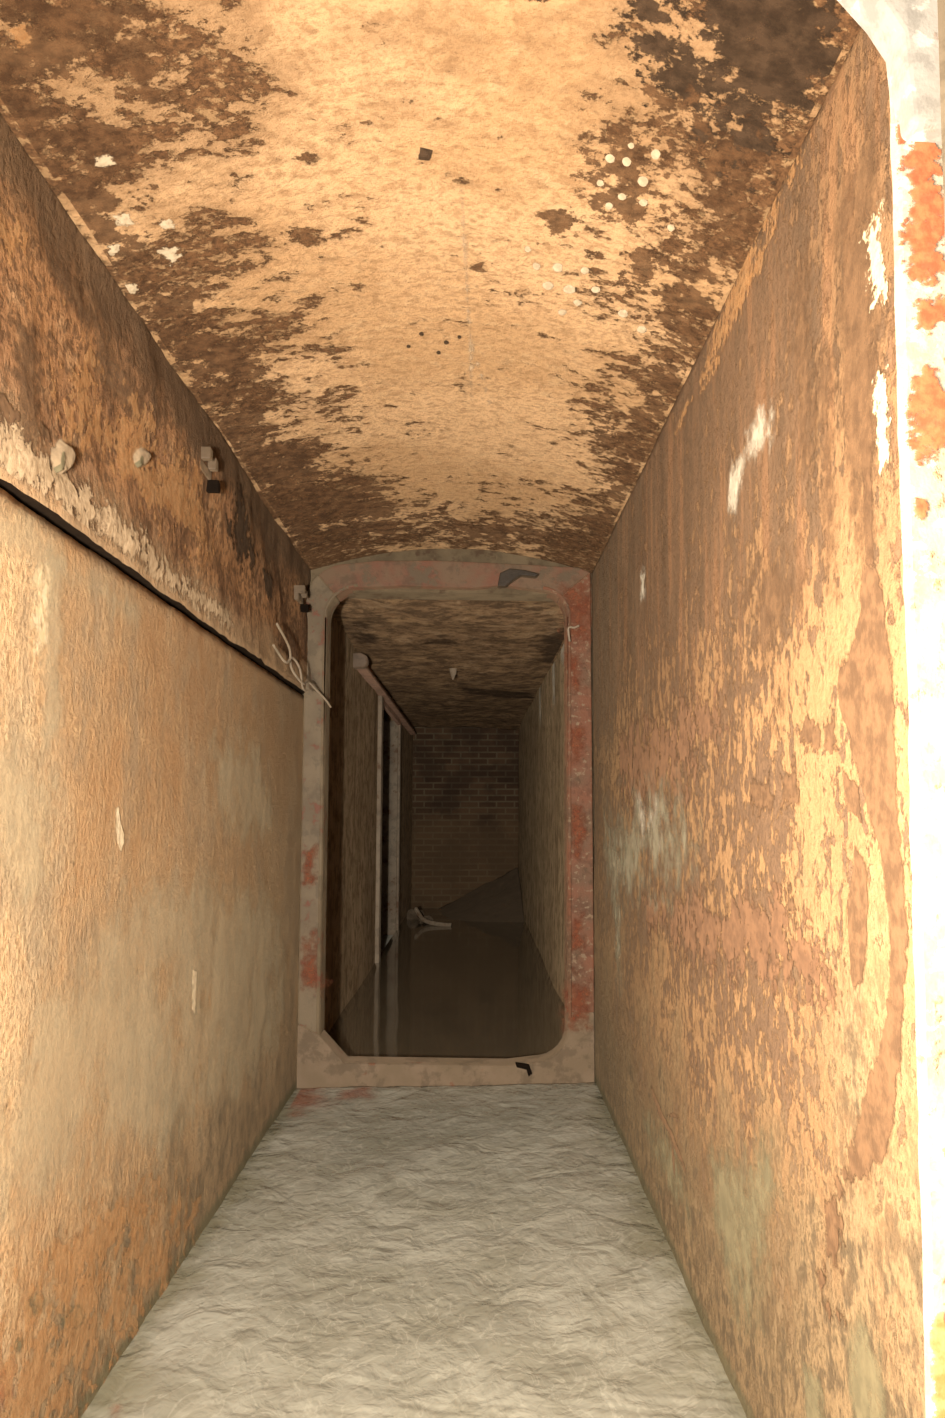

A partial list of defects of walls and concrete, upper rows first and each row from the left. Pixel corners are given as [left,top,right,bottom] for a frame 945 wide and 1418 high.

leakage [17,324,38,447]
peeling [0,0,851,633]
leakage [524,246,600,315]
leakage [605,143,648,210]
leakage [728,410,773,510]
leakage [789,117,879,571]
peeling [862,199,888,314]
corrosion [895,124,945,337]
corrosion [913,497,929,521]
corrosion [904,364,945,466]
peeling [641,358,909,1329]
corrosion [929,1303,945,1418]